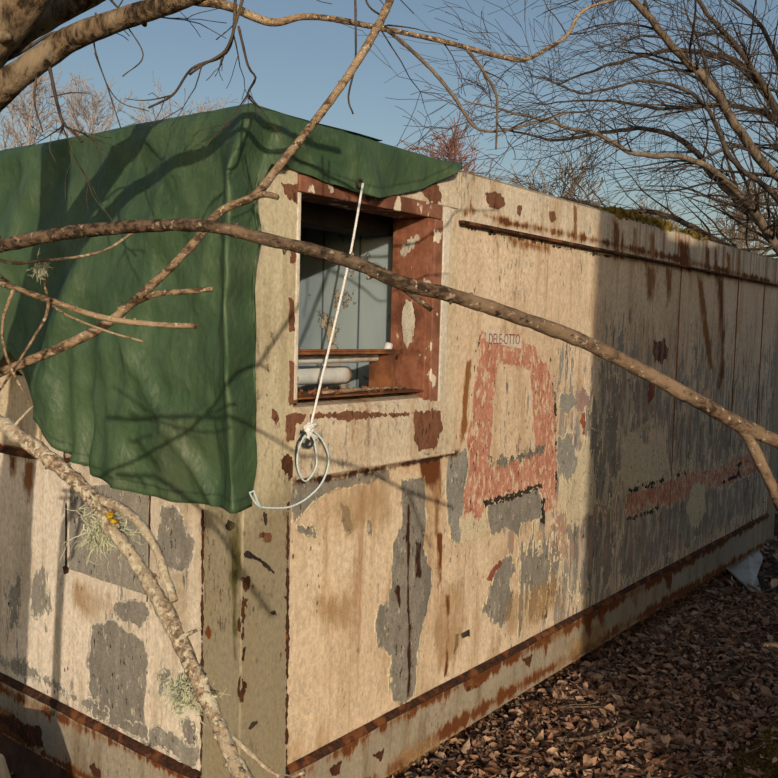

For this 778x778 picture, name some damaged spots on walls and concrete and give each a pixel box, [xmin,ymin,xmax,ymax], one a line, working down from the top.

peeling [400,236,416,258]
peeling [401,300,415,348]
corrosion [485,191,771,387]
peeling [445,359,748,642]
corrosion [0,682,95,739]
corrosion [0,707,96,778]
peeling [0,485,200,769]
corrosion [200,509,211,667]
corrosion [327,734,369,776]
peeling [291,469,433,707]
corrosion [373,504,769,777]